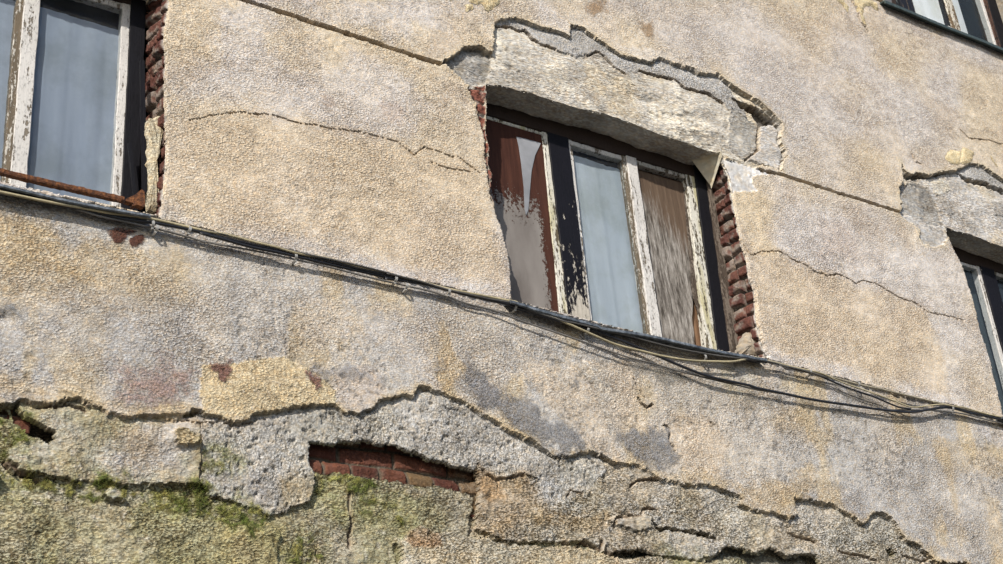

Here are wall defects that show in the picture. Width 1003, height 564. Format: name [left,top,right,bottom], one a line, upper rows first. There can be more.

peeling [465,0,500,12]
flaking render [144,0,169,216]
crack [189,111,481,174]
corrosion [0,168,145,210]
flaking render [441,17,788,358]
flaking render [899,147,1003,247]
corrosion [108,227,144,247]
crack [743,244,965,321]
flaking render [0,385,969,564]